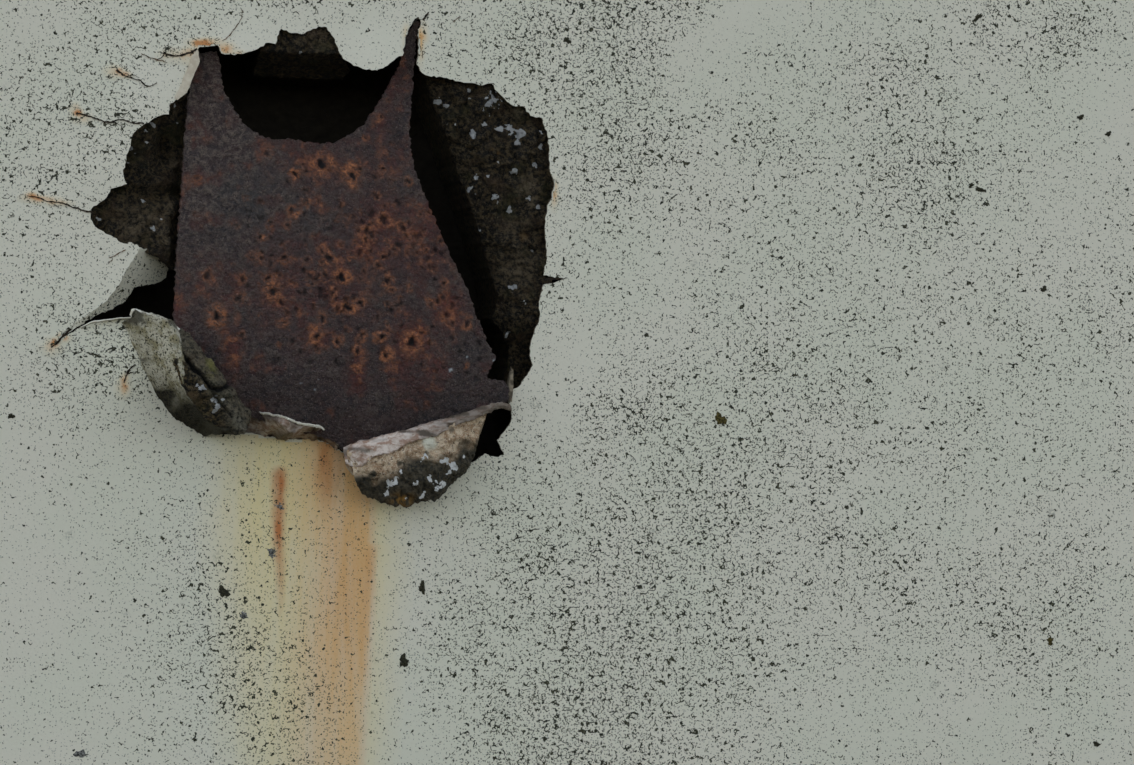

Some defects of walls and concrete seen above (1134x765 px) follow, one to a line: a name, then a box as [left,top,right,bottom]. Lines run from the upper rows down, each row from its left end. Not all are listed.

crack [116,8,243,87]
rust [154,34,248,66]
rust [400,19,431,69]
crack [76,112,144,127]
spalling [55,19,563,507]
rust [193,434,416,765]